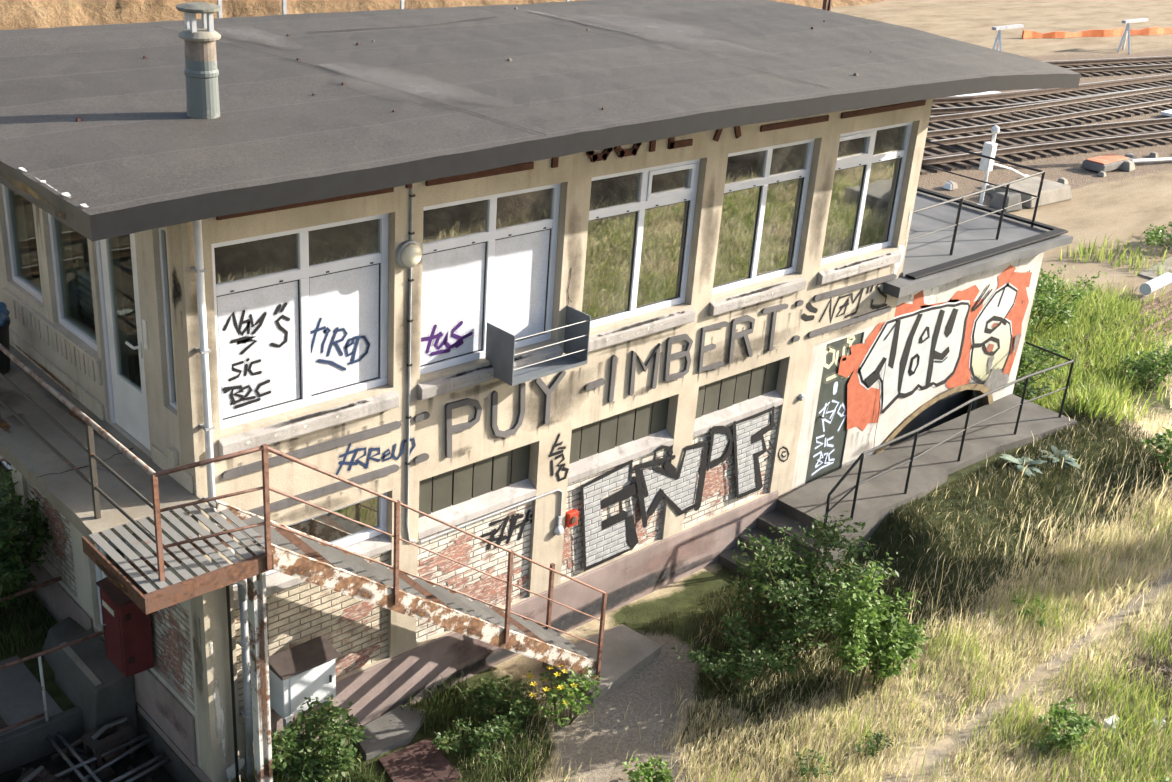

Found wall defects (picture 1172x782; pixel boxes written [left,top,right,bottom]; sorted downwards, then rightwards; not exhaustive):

peeling [696,463,736,503]
peeling [33,488,70,562]
peeling [633,494,658,545]
rust [282,565,313,577]
peeling [418,534,529,603]
peeling [562,526,574,569]
peeling [337,601,375,624]
rust [348,587,375,599]
rust [258,602,269,738]
peeling [335,645,380,676]